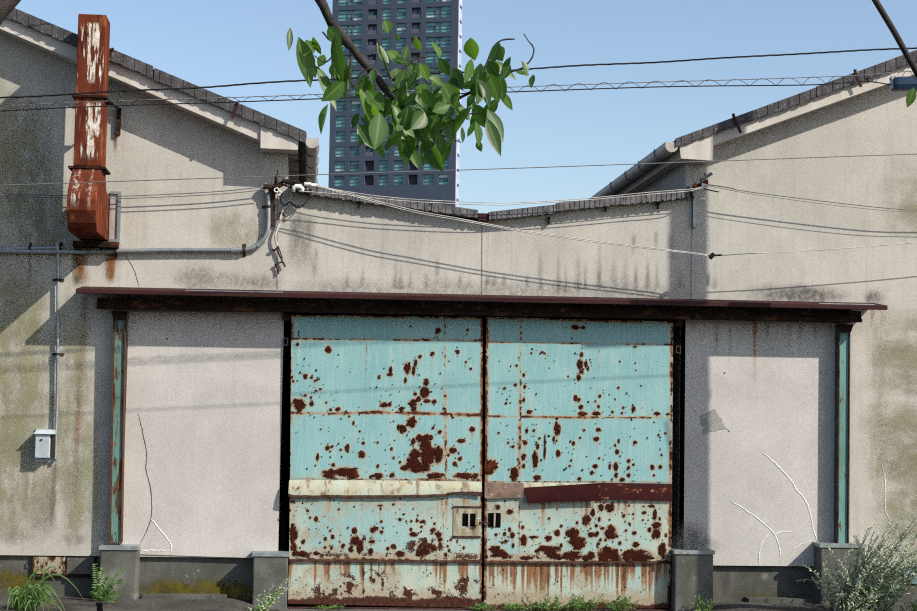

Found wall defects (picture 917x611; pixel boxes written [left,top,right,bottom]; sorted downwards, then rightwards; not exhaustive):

corrosion [76,248,87,280]
corrosion [106,254,116,279]
corrosion [291,344,671,483]
spalling [686,399,730,442]
crack [138,412,172,554]
corrosion [289,500,405,560]
corrosion [393,498,473,565]
corrosion [482,501,667,595]
crack [732,453,818,563]